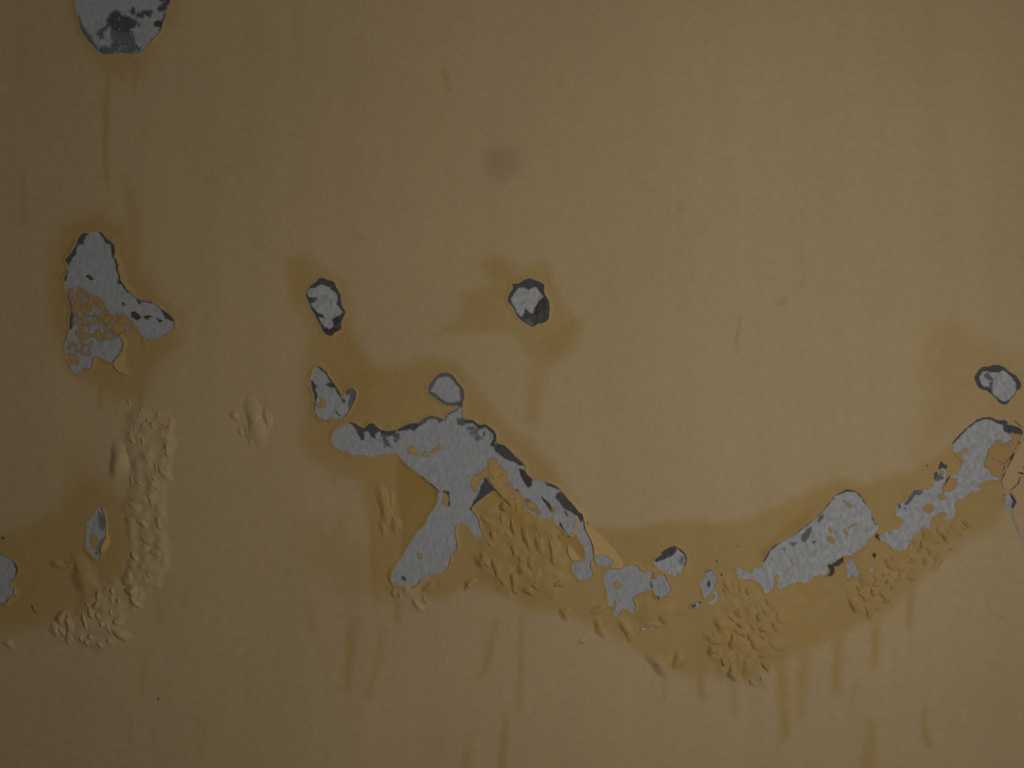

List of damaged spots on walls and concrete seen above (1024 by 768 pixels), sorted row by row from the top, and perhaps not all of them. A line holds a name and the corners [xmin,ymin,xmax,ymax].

peeling [307,362,690,619]